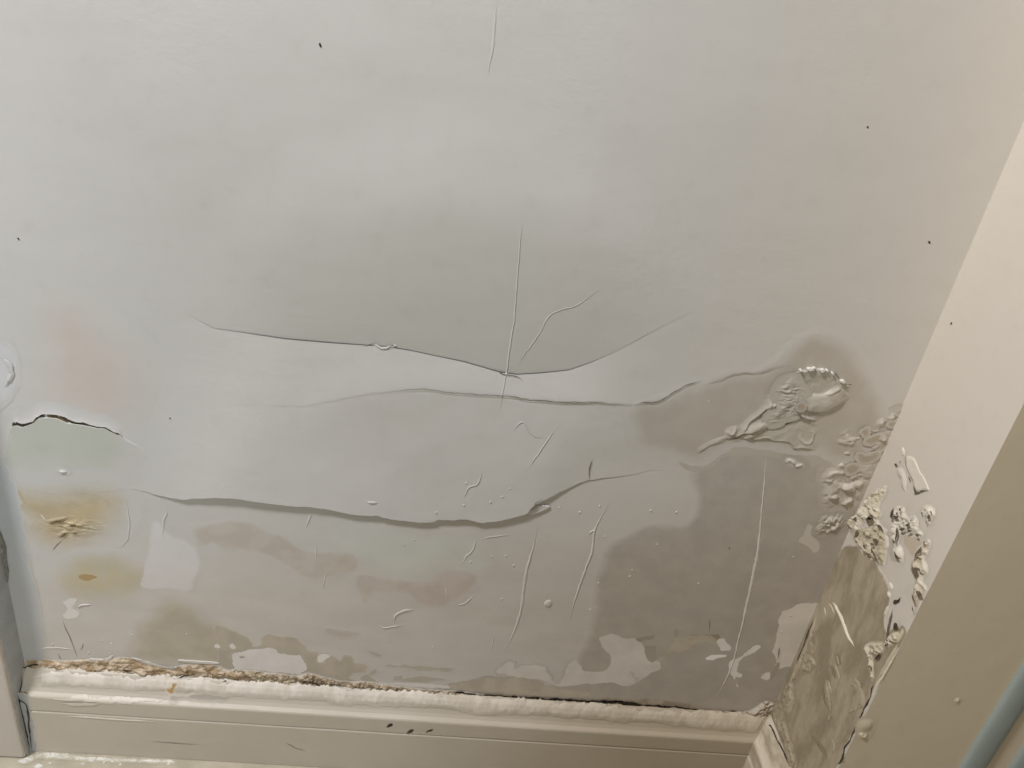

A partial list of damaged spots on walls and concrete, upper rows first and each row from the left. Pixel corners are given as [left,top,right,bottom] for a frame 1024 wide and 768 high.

crack [383,370,609,404]
crack [637,365,787,405]
crack [11,401,122,437]
leakage [115,324,896,712]
flaking render [705,447,937,768]
spalling [23,655,484,695]